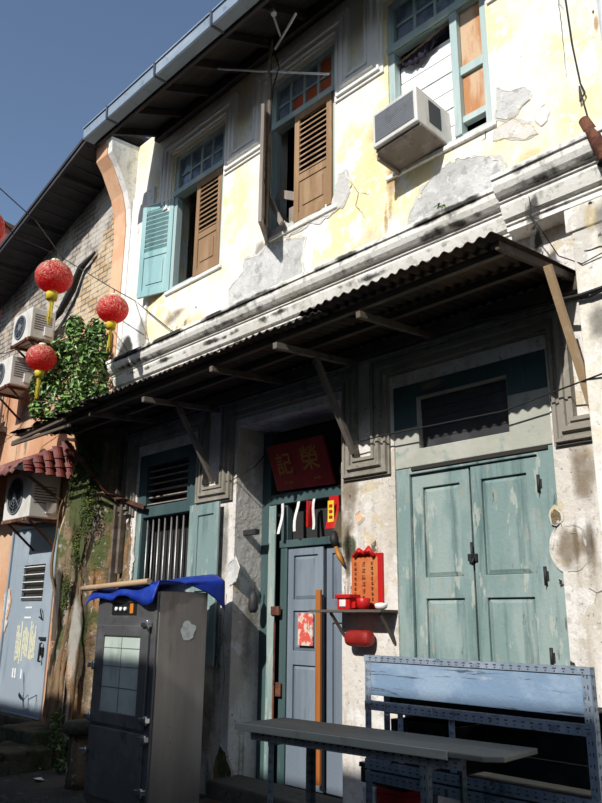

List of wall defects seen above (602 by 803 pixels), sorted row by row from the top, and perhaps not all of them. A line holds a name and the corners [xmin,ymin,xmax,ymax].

spalling [493,86,551,142]
spalling [228,169,351,306]
water stain [413,195,481,242]
spalling [406,154,509,226]
water stain [525,195,550,254]
water stain [202,284,285,351]
water stain [574,454,590,495]
spalling [549,505,563,526]
water stain [560,528,595,564]
water stain [44,569,61,701]
water stain [68,604,80,675]